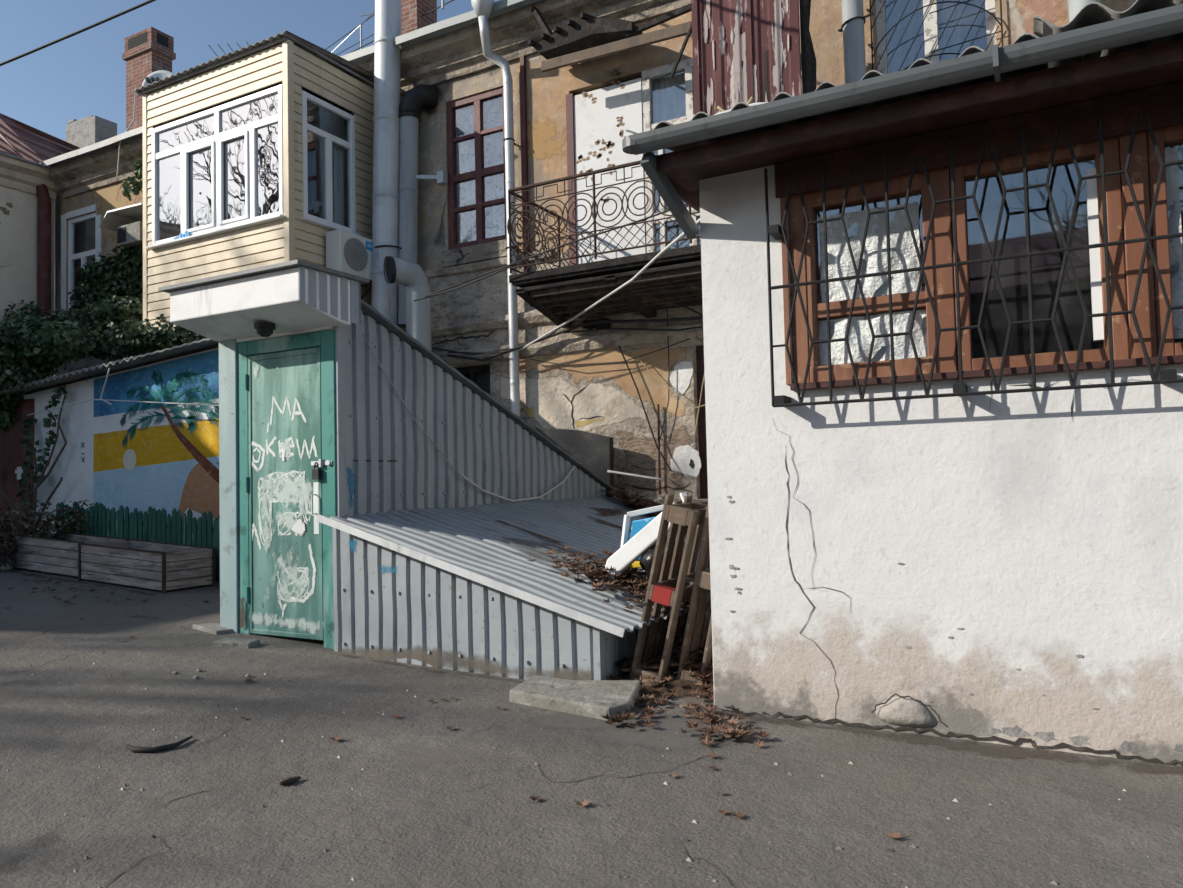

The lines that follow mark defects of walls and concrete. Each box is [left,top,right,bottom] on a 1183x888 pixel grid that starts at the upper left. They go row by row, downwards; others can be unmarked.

peeling [703,0,795,115]
flaking render [500,346,690,496]
crack [717,418,1183,765]
water stain [713,674,816,721]
water stain [860,694,985,741]
water stain [1120,742,1183,766]